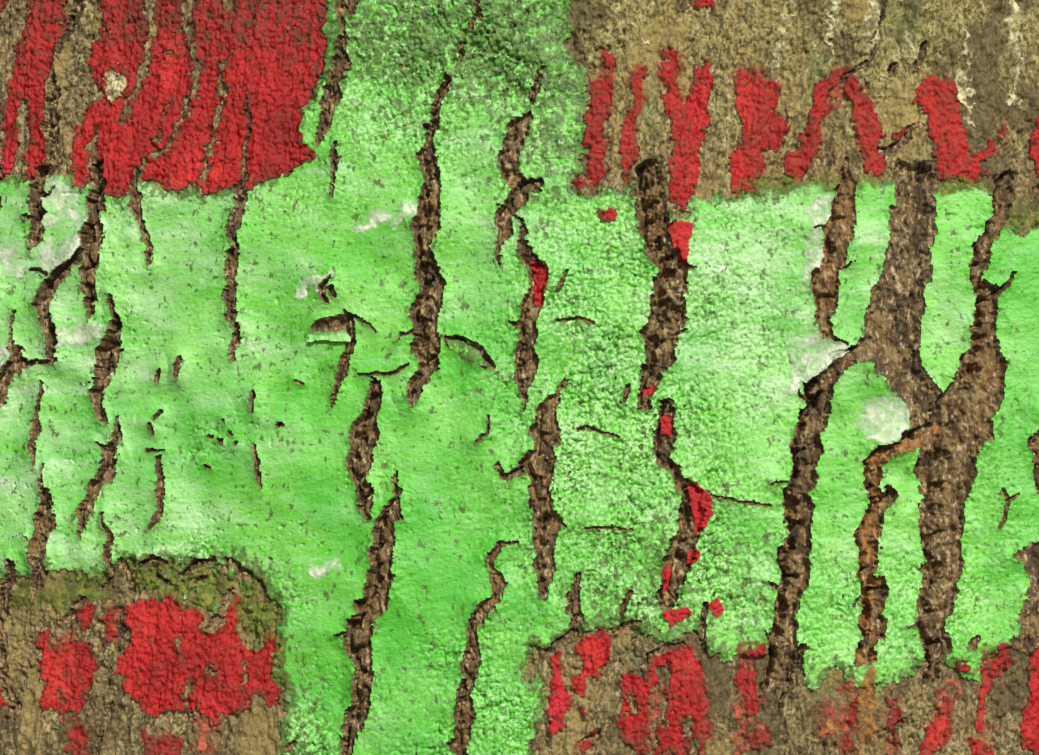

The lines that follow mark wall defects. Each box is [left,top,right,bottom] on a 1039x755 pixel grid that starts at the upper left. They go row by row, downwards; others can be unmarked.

spalling [102,69,127,103]
peeling [572,47,714,211]
crack [0,0,274,726]
crack [330,0,483,755]
crack [447,65,633,755]
crack [613,156,857,717]
crack [852,168,1039,689]
peeling [35,602,119,755]
peeling [141,727,184,755]
peeling [545,625,612,737]
peeling [616,645,714,755]
crack [893,714,912,728]